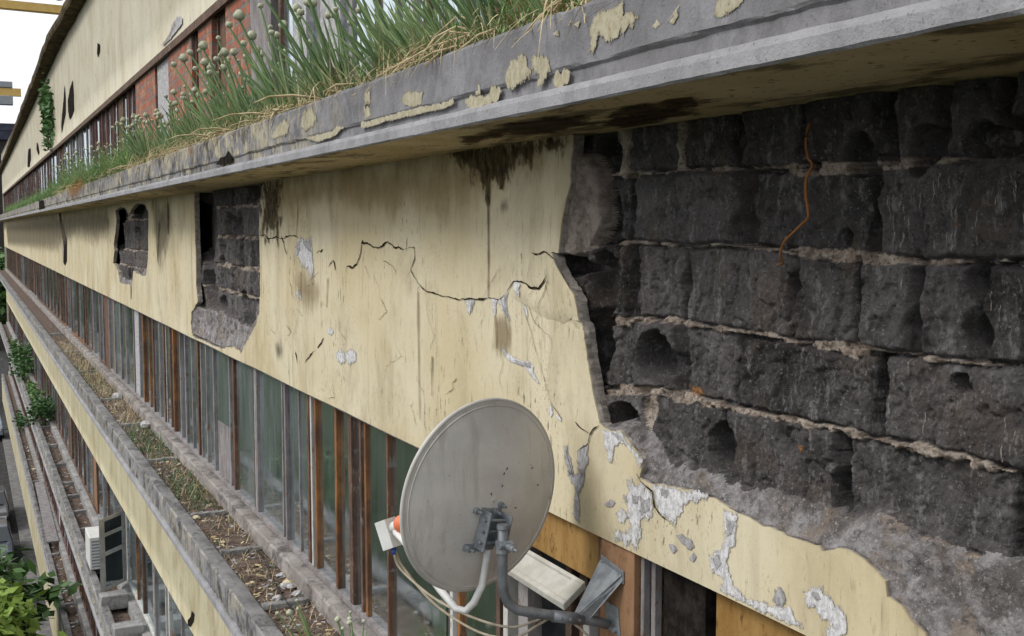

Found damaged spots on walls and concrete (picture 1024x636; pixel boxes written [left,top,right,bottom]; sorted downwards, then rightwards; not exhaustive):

peeling [573,0,638,55]
peeling [713,0,743,18]
peeling [270,106,344,143]
peeling [361,52,570,129]
damp [447,98,713,278]
rust [777,122,814,266]
spalling [117,204,149,297]
spalling [192,184,263,352]
peeling [295,237,314,280]
crack [272,240,599,475]
spalling [563,71,1024,636]